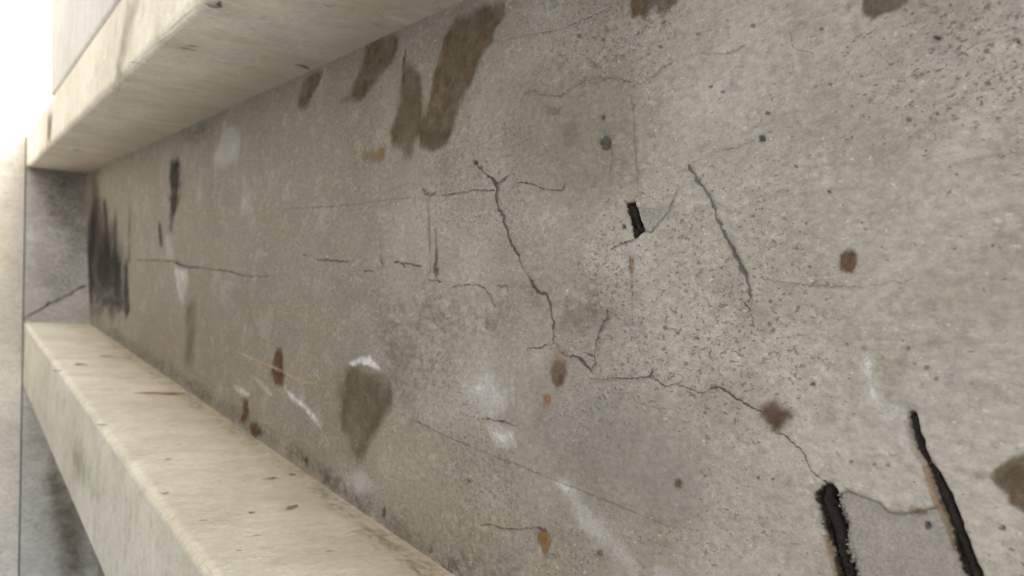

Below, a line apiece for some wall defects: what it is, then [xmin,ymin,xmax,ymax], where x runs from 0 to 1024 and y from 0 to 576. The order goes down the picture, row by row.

leakage [353,4,504,148]
leakage [169,159,181,216]
spalling [622,201,673,239]
leakage [48,178,130,317]
crack [137,259,270,277]
corrosion [840,250,856,272]
crack [23,279,128,320]
crack [442,164,831,485]
corrosion [271,351,283,383]
corrosion [551,359,566,386]
corrosion [763,404,788,429]
leakage [993,455,1024,511]